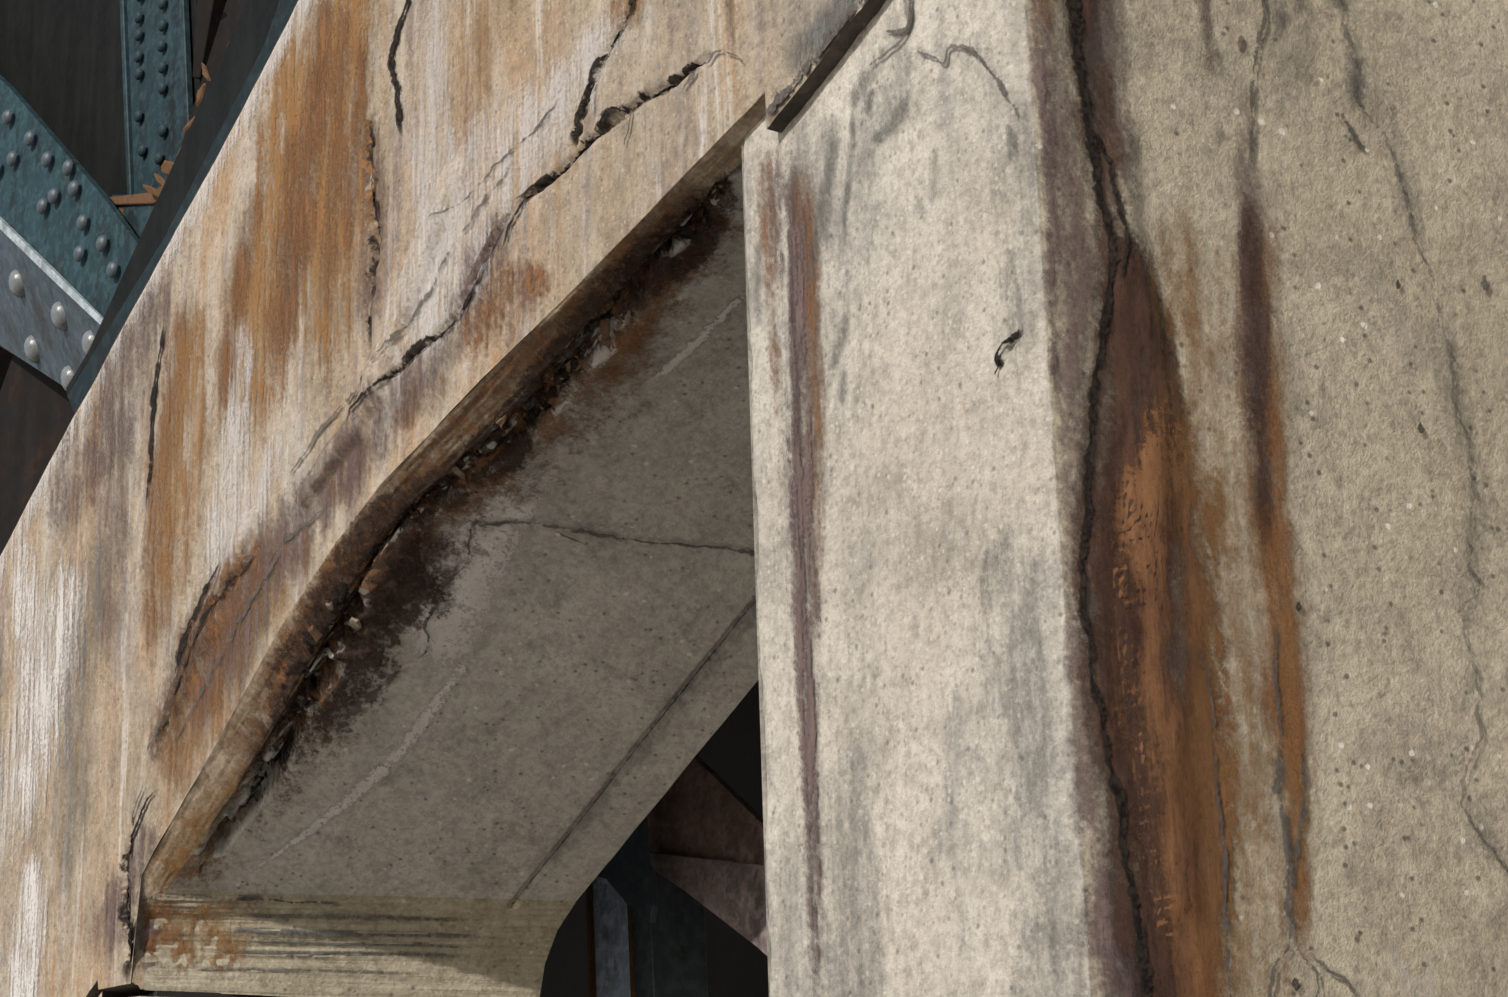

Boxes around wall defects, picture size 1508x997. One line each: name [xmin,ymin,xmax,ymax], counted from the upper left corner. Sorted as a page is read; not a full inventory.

crack [146,328,164,503]
crack [118,502,328,975]
leakage [165,20,604,729]
corrosion [138,0,688,971]
leakage [246,457,610,873]
crack [291,0,743,472]
leakage [585,315,634,369]
leakage [655,277,758,379]
corrosion [757,151,824,983]
crack [870,0,1160,997]
corrosion [1086,130,1314,997]
crack [1207,628,1355,997]